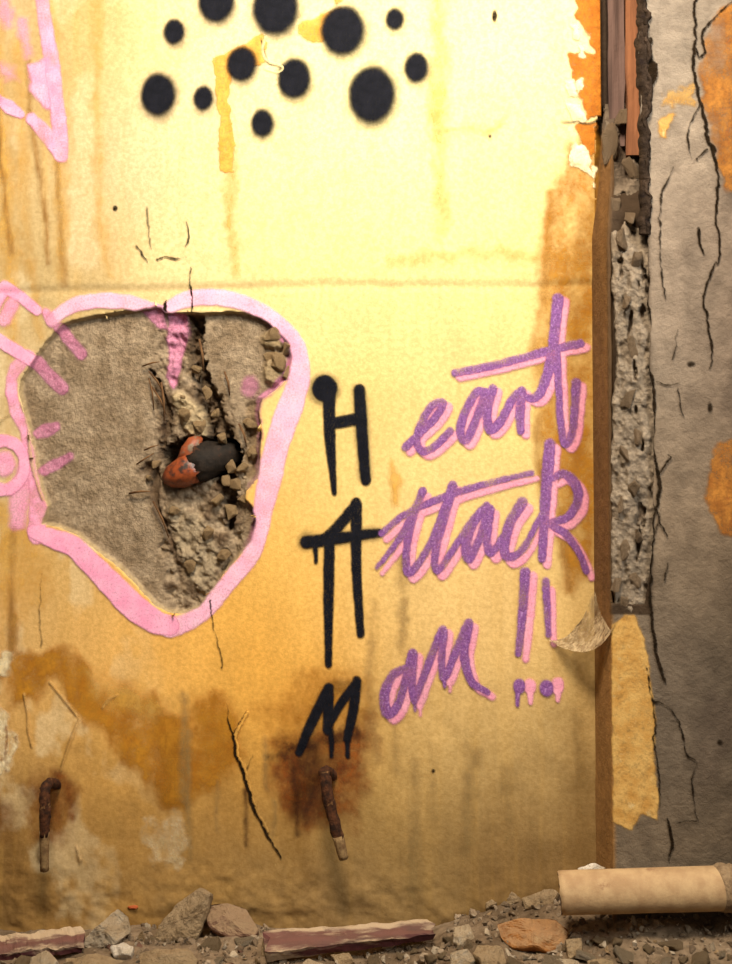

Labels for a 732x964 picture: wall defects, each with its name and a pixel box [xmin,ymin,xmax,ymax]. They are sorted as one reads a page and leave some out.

crack [648,37,658,85]
crack [647,171,672,320]
crack [686,0,732,369]
spalling [19,306,291,614]
spalling [565,0,732,830]
peeling [0,651,12,676]
peeling [0,711,18,774]
water stain [0,618,237,808]
crack [227,711,281,858]
rust [268,727,370,829]
rust [320,680,347,704]
crack [646,371,697,861]